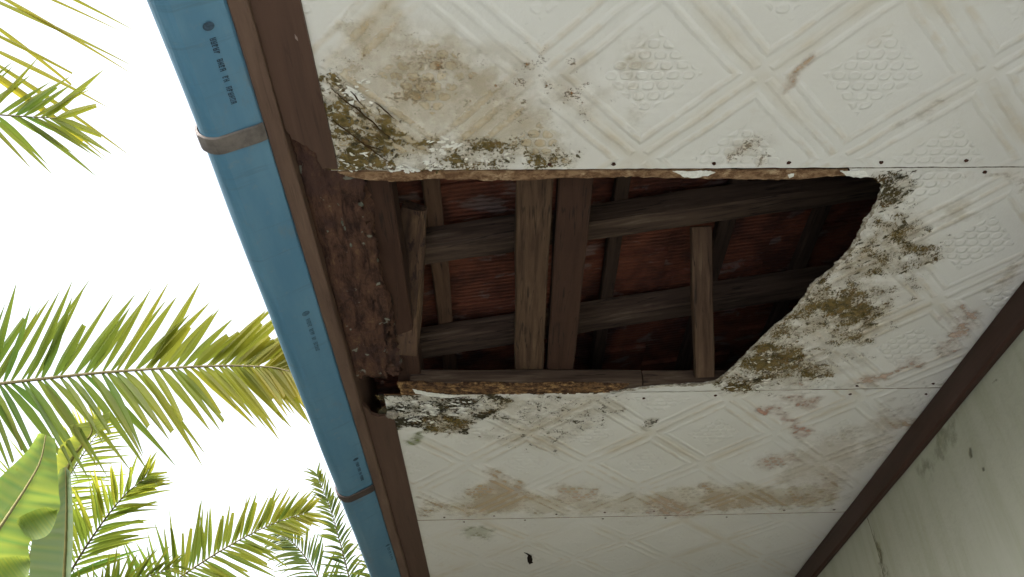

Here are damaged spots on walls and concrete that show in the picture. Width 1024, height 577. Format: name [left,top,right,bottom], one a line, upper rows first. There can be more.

leakage [319,21,582,174]
peeling [388,136,511,174]
peeling [673,170,715,178]
peeling [841,170,871,178]
spalling [619,192,882,392]
leakage [713,169,944,396]
peeling [413,389,469,398]
leakage [376,393,625,452]